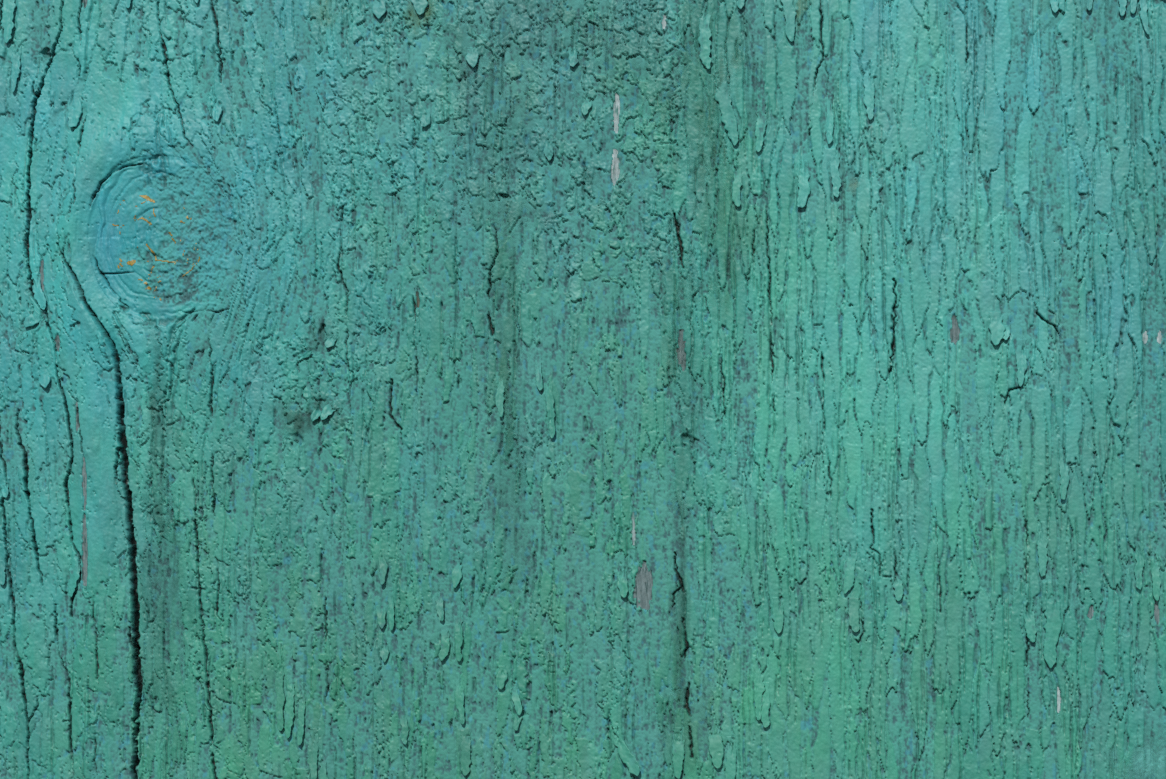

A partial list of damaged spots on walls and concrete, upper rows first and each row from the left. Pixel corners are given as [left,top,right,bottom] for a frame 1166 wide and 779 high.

crack [213,8,223,71]
crack [25,46,56,328]
peeling [611,149,620,186]
crack [675,220,683,265]
crack [64,395,74,528]
crack [76,250,143,773]
crack [0,416,40,729]
peeling [617,561,653,610]
peeling [1134,541,1162,625]
crack [69,679,97,751]
crack [208,684,217,779]
crack [685,687,693,757]